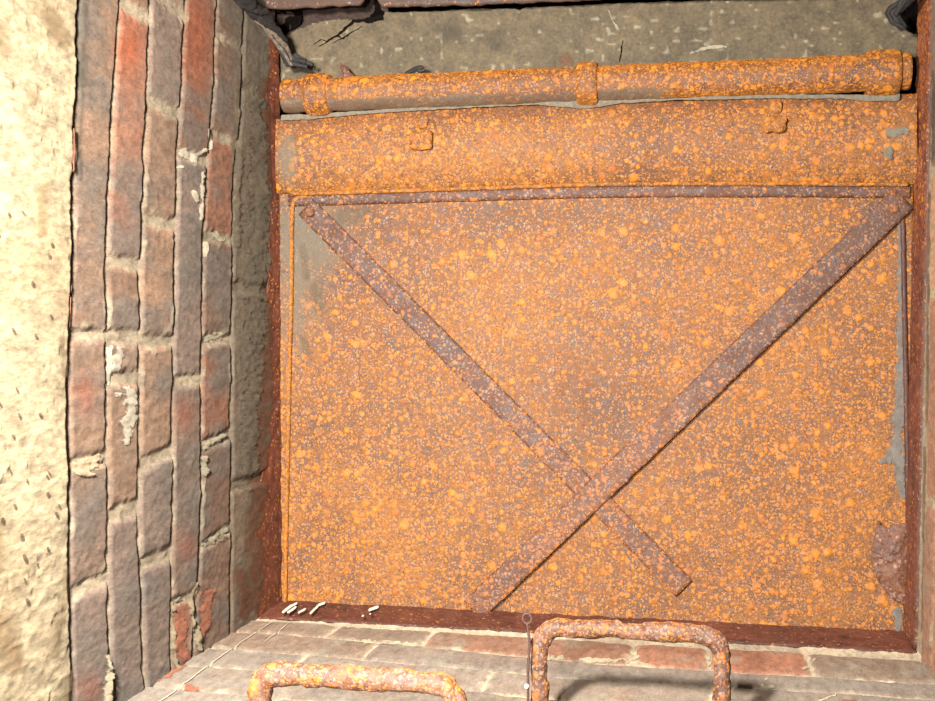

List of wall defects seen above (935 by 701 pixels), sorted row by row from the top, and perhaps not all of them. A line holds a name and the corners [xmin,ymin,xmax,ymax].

crack [314,15,384,46]
rust [871,521,908,604]